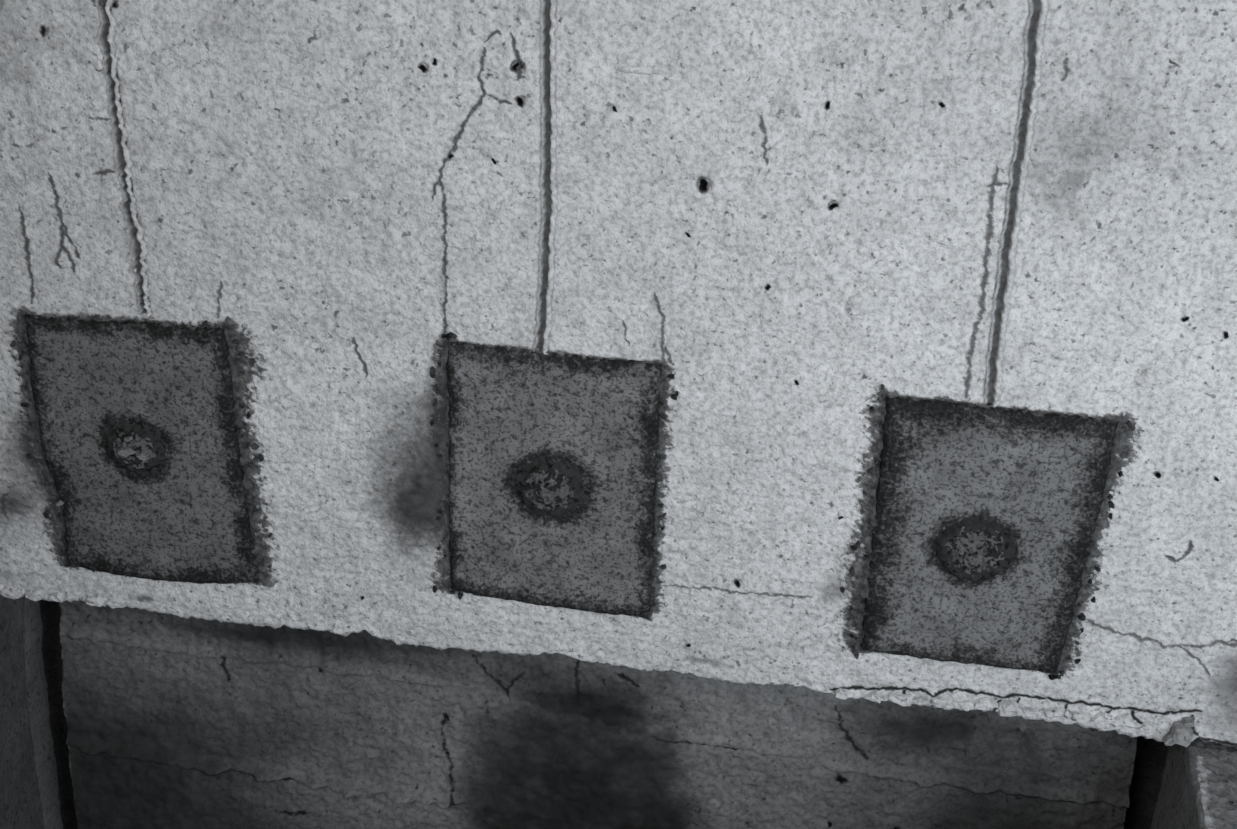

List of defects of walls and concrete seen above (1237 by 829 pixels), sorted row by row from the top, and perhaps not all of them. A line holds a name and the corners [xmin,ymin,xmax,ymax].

crack [89,0,152,317]
crack [432,0,558,354]
crack [964,0,1070,407]
crack [830,685,1237,759]
crack [1088,620,1237,676]